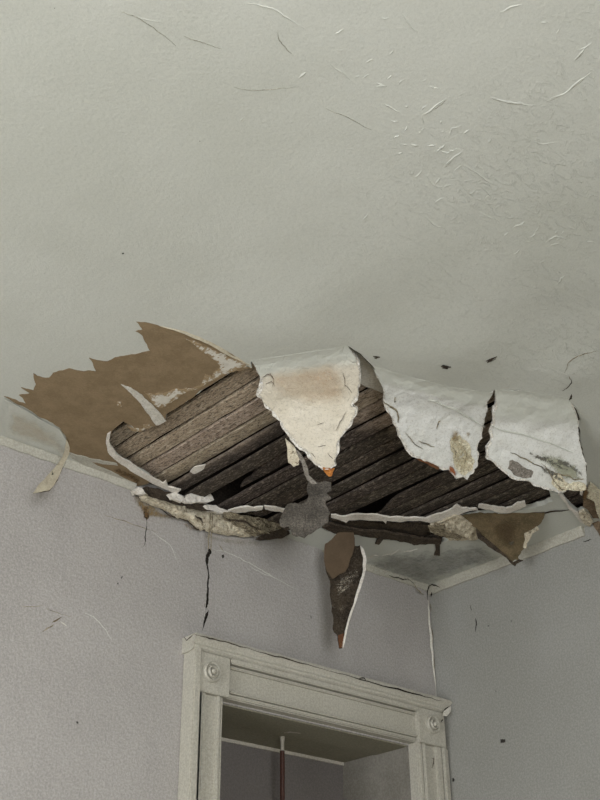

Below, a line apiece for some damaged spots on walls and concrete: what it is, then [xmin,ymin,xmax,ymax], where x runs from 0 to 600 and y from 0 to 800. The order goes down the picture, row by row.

flaking render [350,347,383,393]
peeling [2,322,281,537]
crack [383,351,595,490]
peeling [508,460,533,478]
flaking render [428,514,478,541]
flaking render [558,482,600,536]
crack [184,513,440,701]